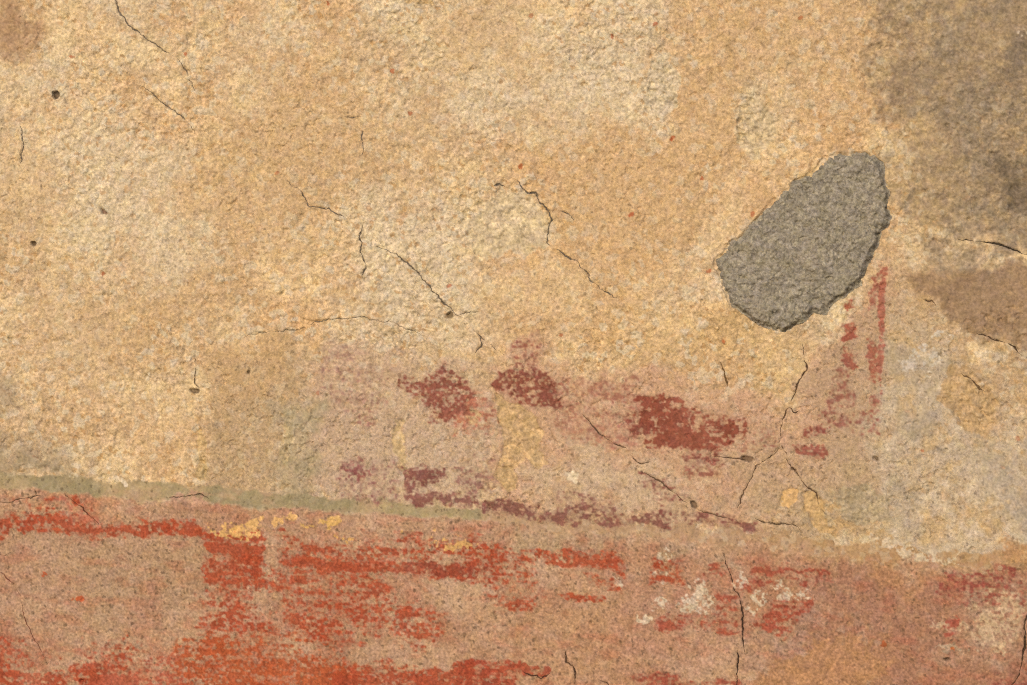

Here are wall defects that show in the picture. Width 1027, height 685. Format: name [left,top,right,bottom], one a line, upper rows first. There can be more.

crack [286,180,504,355]
crack [494,181,614,298]
crack [582,344,825,530]
peeling [0,491,630,685]
peeling [646,555,688,587]
peeling [630,669,745,685]
crack [724,556,745,685]
peeling [652,561,835,642]
peeling [933,562,1027,639]
peeling [987,668,1027,685]
crack [1012,615,1027,685]